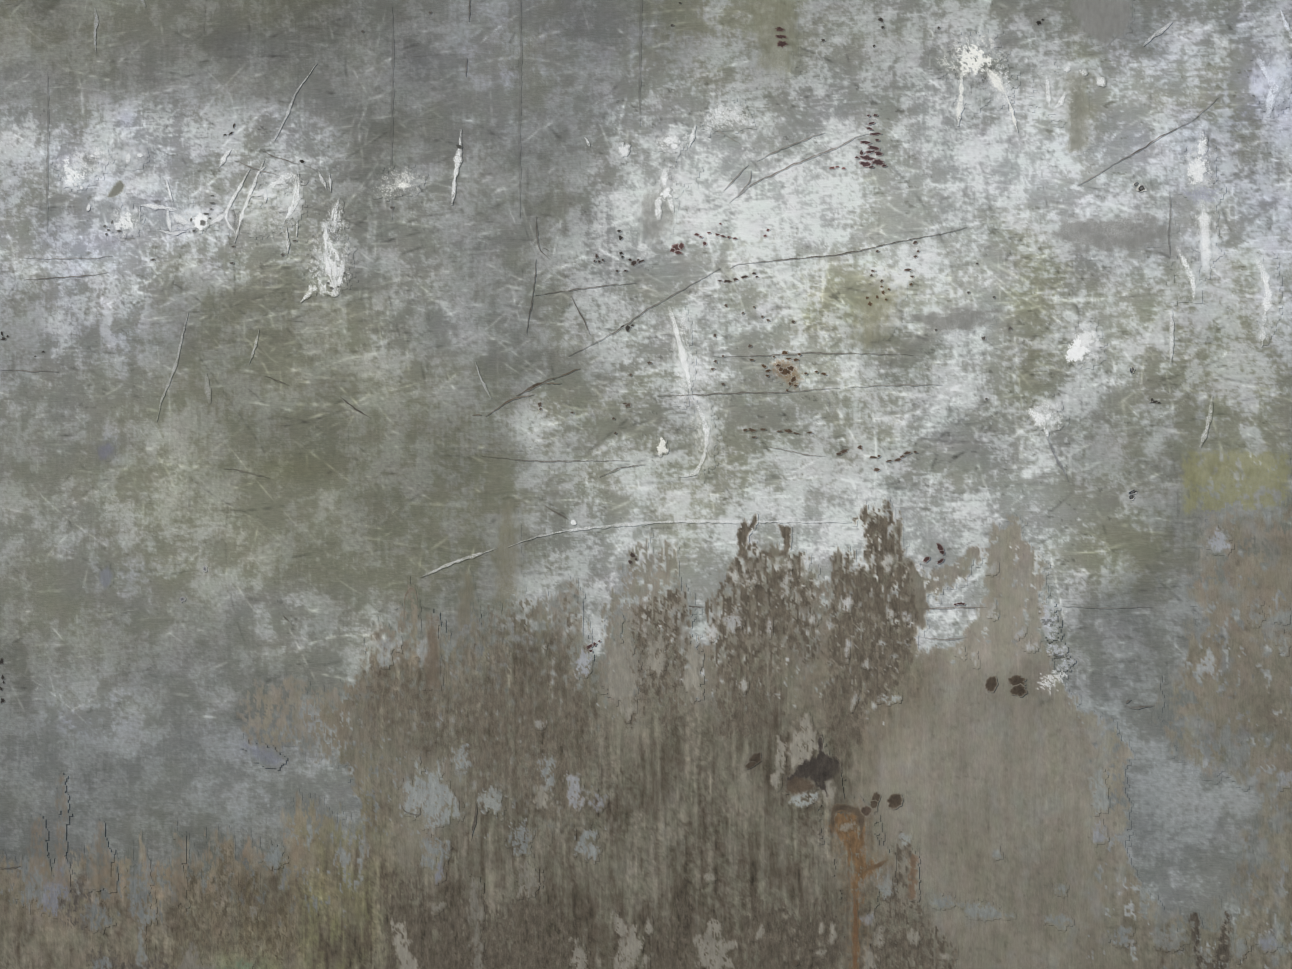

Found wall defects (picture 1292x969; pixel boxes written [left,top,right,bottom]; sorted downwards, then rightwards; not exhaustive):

damp [403,494,851,691]
damp [745,751,762,769]
damp [784,734,846,816]
damp [861,791,904,816]
corrosion [815,791,896,969]
damp [1186,910,1235,969]